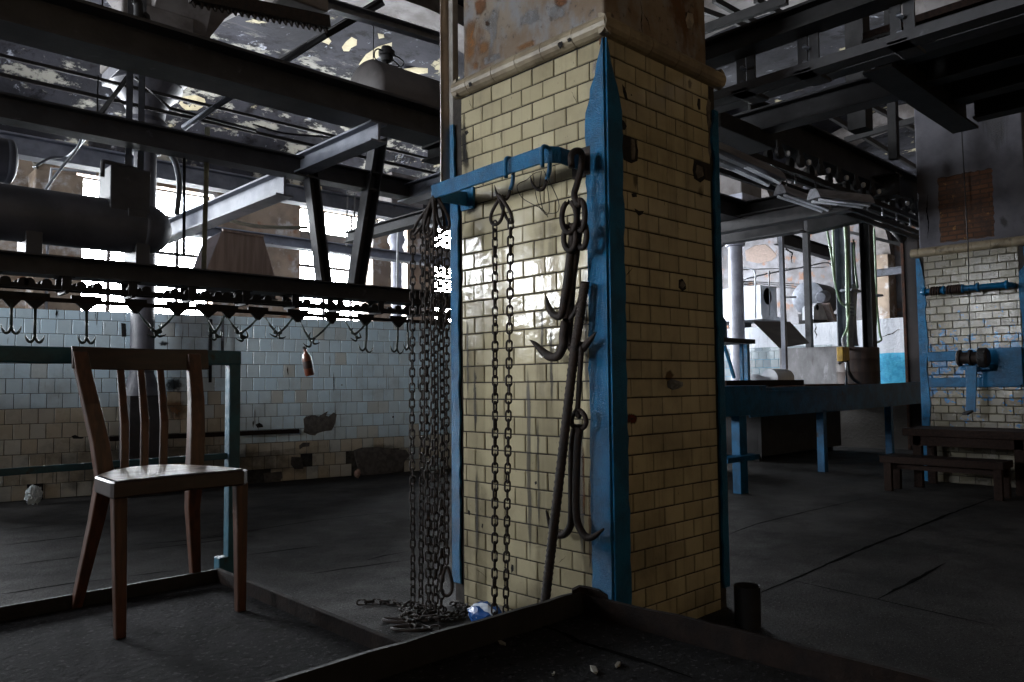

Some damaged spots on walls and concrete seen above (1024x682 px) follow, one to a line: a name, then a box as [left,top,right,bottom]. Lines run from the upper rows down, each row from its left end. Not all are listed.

peeling [323,37,357,51]
peeling [359,33,392,65]
peeling [179,95,205,110]
flaking render [937,168,995,243]
spalling [291,411,337,469]
damp [527,383,540,544]
damp [580,444,592,567]